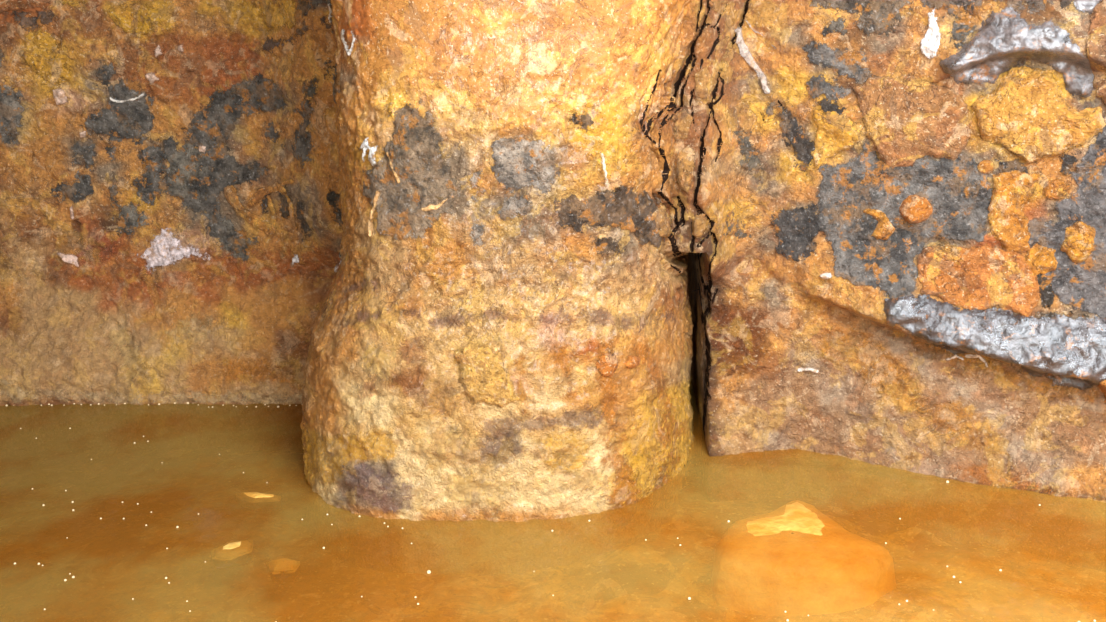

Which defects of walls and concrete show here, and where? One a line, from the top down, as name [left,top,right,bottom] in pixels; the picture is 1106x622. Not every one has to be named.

corrosion [128,24,260,104]
corrosion [694,36,735,102]
corrosion [672,109,695,193]
corrosion [812,0,1106,317]
corrosion [49,179,341,292]
corrosion [652,205,672,237]
crack [639,0,749,488]
corrosion [692,213,710,239]
corrosion [711,304,765,374]
corrosion [277,329,412,512]
corrosion [480,344,687,528]
corrosion [234,492,281,511]